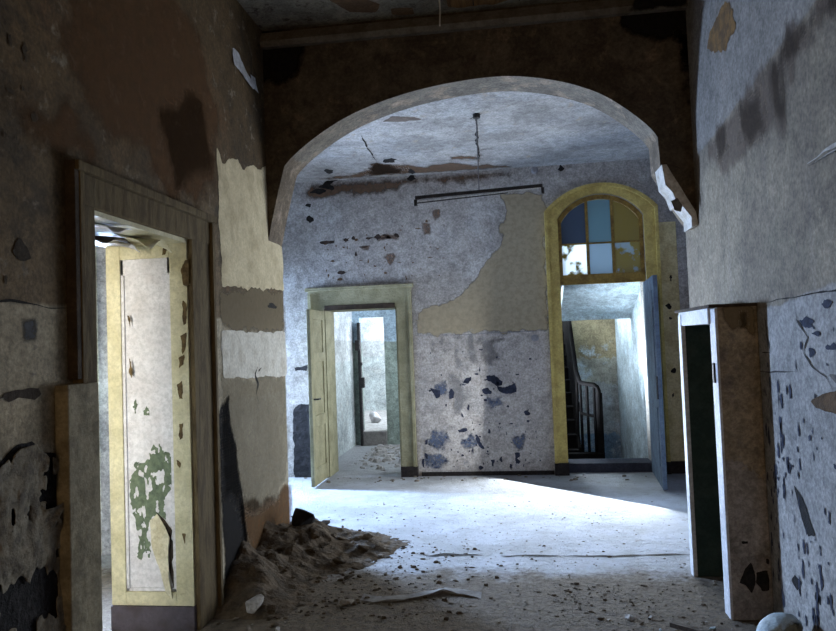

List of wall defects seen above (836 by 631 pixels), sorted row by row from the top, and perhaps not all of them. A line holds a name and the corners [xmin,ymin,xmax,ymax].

peeling [707,2,736,53]
leakage [708,0,836,171]
crack [0,299,59,309]
peeling [179,301,187,368]
peeling [217,149,284,291]
spalling [320,225,403,281]
leakage [305,156,509,223]
flaking render [416,192,549,470]
crack [760,289,836,388]
peeling [0,441,67,631]
peeling [129,444,181,599]
peeling [764,377,834,630]